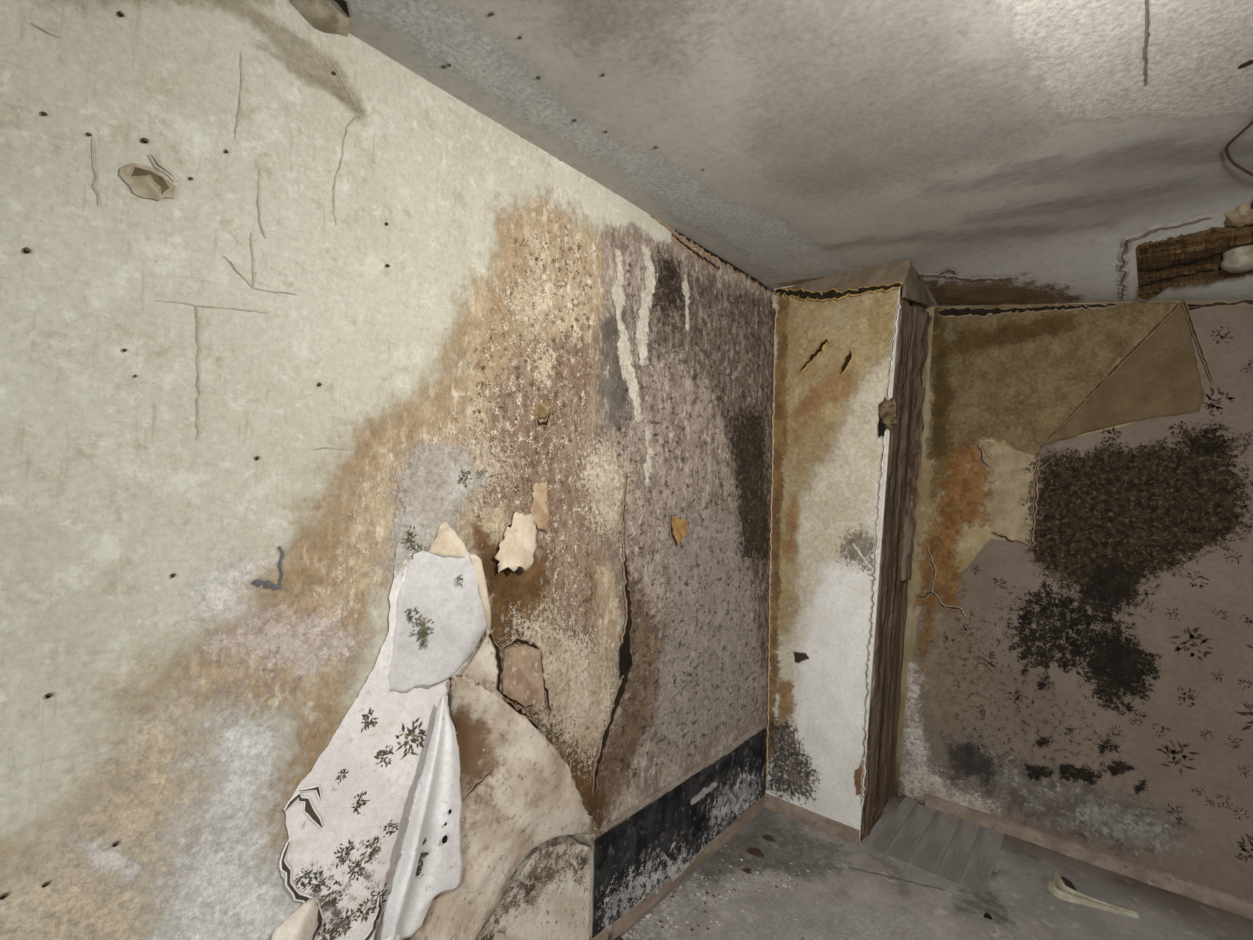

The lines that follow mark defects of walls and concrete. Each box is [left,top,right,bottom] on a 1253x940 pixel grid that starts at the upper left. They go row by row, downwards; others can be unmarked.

spalling [119,154,178,201]
crack [156,170,298,440]
peeling [1039,300,1213,448]
crack [1143,0,1151,86]
peeling [271,898,319,940]
damp [0,196,899,940]
peeling [381,637,602,940]
peeling [494,481,551,573]
crack [488,633,561,756]
crack [592,472,634,796]
rust [916,440,992,722]
damp [900,264,1253,858]